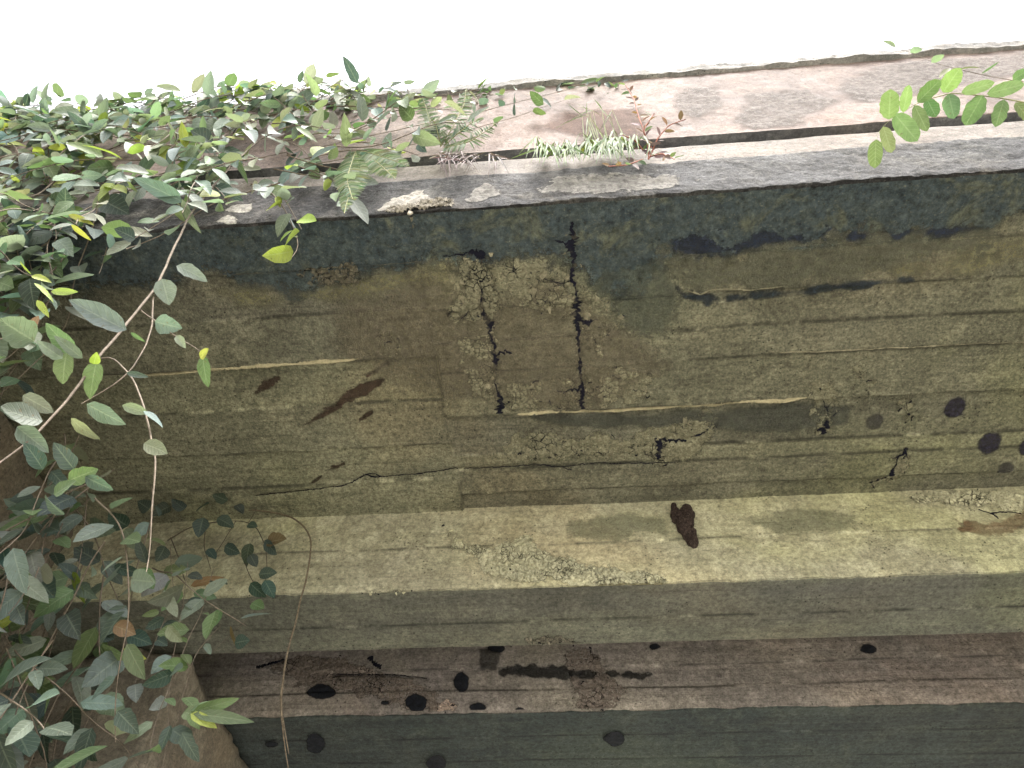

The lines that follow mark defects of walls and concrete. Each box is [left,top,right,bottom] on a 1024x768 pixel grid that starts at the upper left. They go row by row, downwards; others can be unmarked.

water stain [672,225,975,261]
water stain [677,235,1024,307]
crack [444,248,512,414]
crack [545,221,597,409]
water stain [296,256,850,432]
corrosion [303,363,389,426]
crack [256,432,705,496]
crack [869,447,908,492]
water stain [978,433,1002,454]
water stain [306,684,336,699]
water stain [453,672,469,692]
water stain [480,646,653,680]